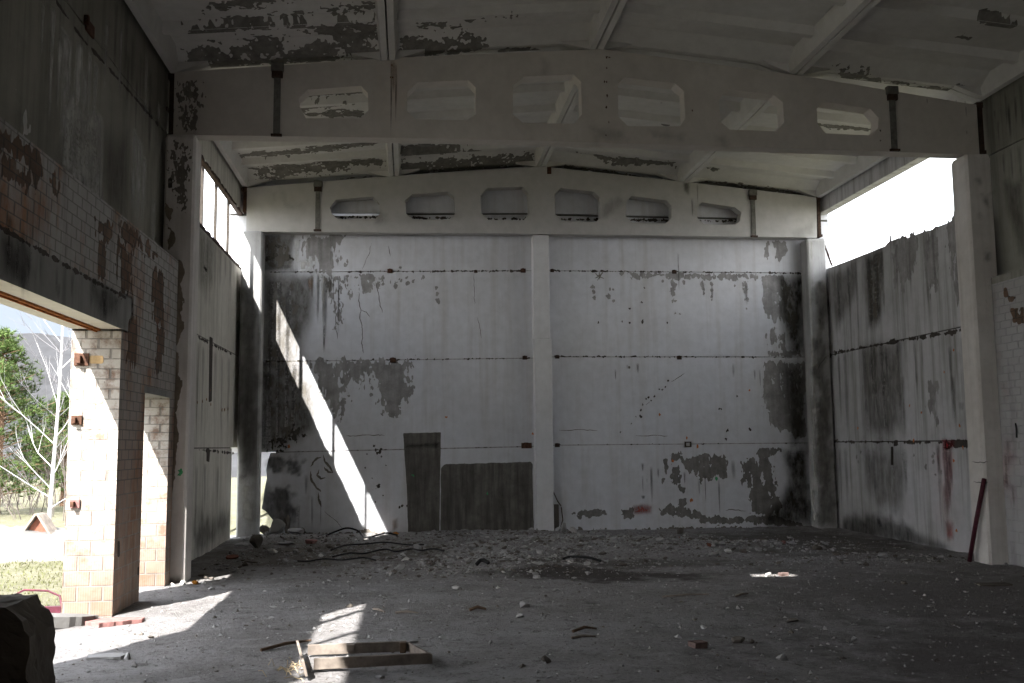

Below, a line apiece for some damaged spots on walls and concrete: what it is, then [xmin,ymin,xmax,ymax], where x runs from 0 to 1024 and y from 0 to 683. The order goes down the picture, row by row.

peeling [180,0,539,68]
peeling [977,8,1018,29]
flaking render [0,110,69,198]
peeling [238,143,386,180]
peeling [400,144,535,174]
peeling [0,224,82,275]
flaking render [94,203,185,492]
peeling [288,355,449,423]
peeling [554,240,807,531]
damp [767,250,884,525]